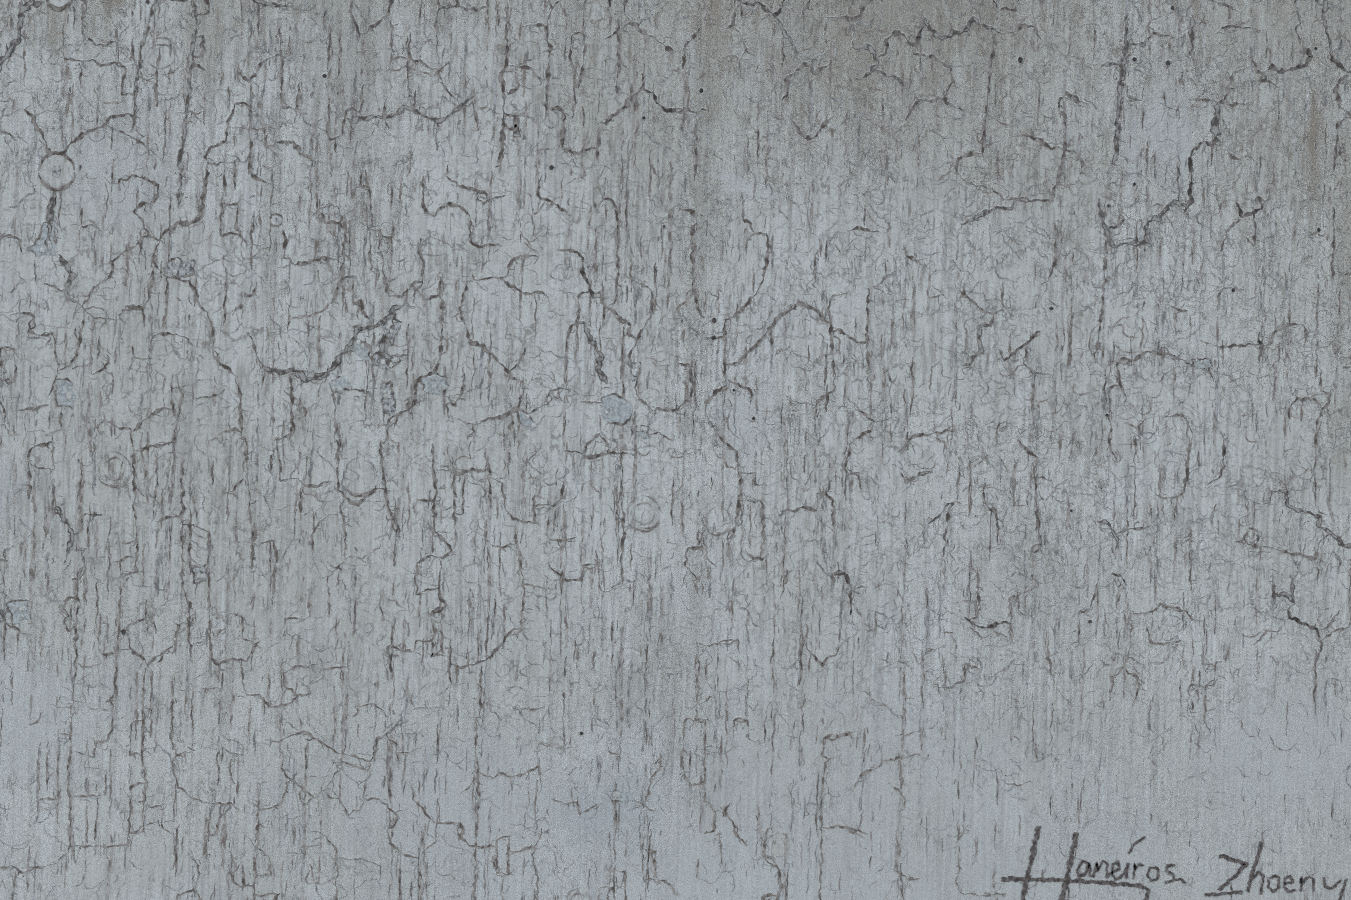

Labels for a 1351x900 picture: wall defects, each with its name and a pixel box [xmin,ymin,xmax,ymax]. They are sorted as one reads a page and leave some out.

spalling [601,393,649,439]
crack [1234,384,1268,461]
crack [0,549,54,703]
crack [29,696,45,726]
crack [581,678,609,743]
crack [1226,692,1260,738]
crack [1285,701,1308,736]
crack [1317,676,1351,758]
crack [590,756,603,788]
crack [942,736,1031,805]
crack [552,783,602,828]
crack [1194,764,1351,853]